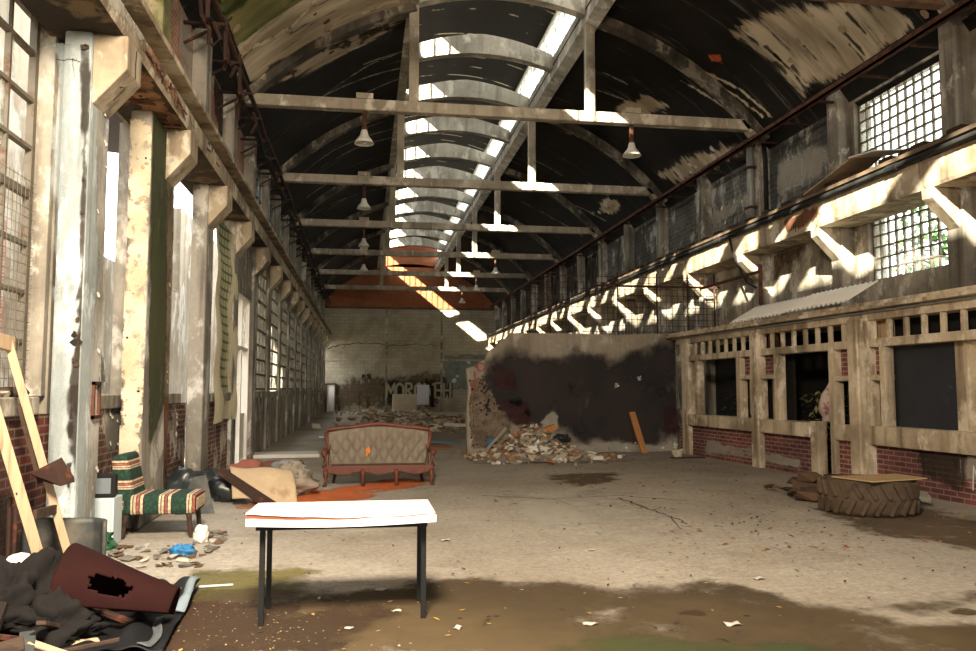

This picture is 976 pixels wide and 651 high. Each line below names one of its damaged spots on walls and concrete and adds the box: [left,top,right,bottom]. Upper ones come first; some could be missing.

peeling [730,2,929,97]
peeling [615,94,669,114]
peeling [658,142,743,185]
corrosion [784,207,820,232]
spalling [444,355,510,448]
damp [163,578,976,651]